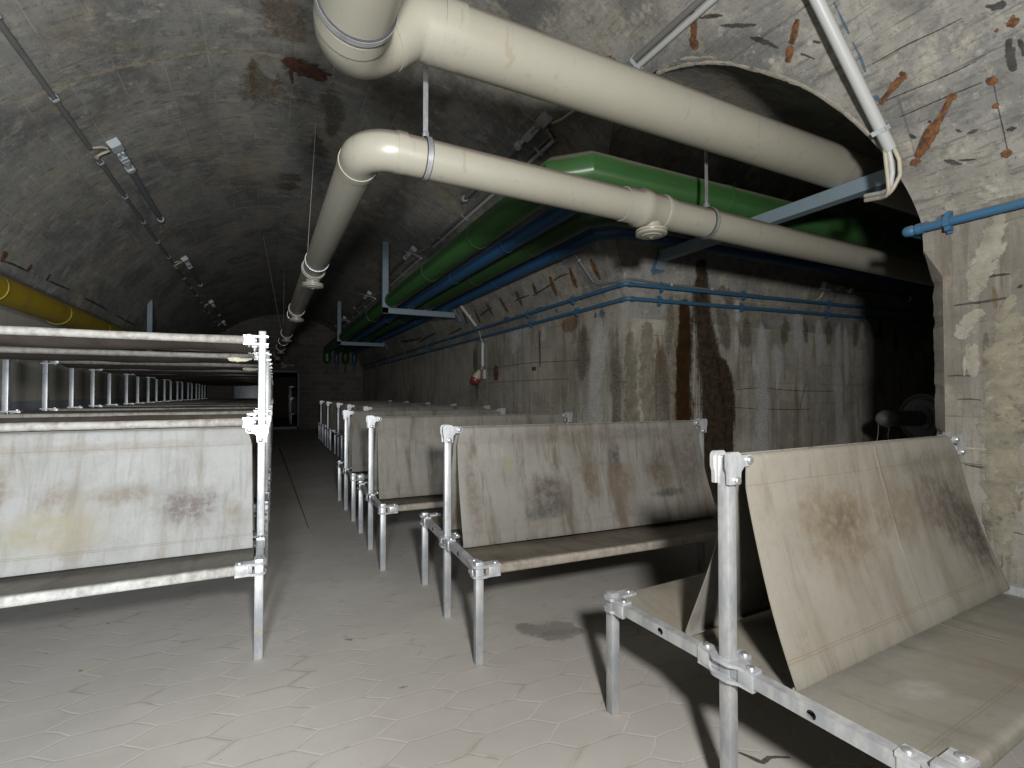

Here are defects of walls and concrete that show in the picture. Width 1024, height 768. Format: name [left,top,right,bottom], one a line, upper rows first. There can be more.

rust [689,11,699,50]
rust [785,19,799,63]
rust [995,15,1020,33]
rust [282,56,332,84]
rust [878,71,907,105]
rust [910,93,958,167]
damp [654,259,898,506]
peeling [953,213,1024,567]
damp [517,622,582,640]